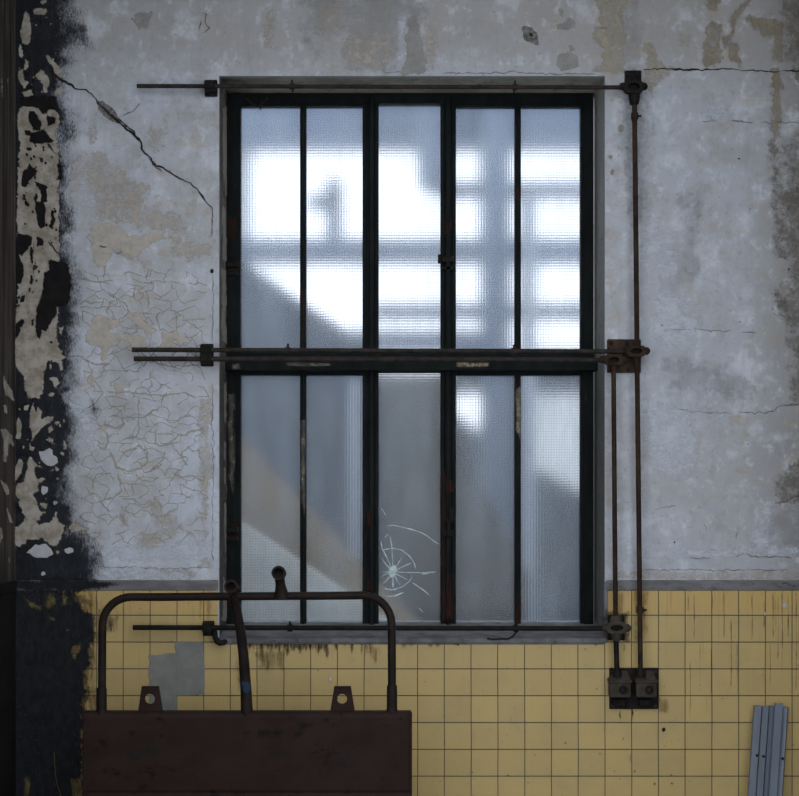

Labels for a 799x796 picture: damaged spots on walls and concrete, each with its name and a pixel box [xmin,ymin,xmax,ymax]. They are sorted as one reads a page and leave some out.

crack [643,66,799,74]
crack [46,60,213,235]
water stain [703,0,799,357]
peeling [87,197,210,267]
peeling [1,0,89,558]
peeling [86,312,190,360]
crack [73,267,215,570]
peeling [149,641,205,710]
water stain [247,644,337,670]